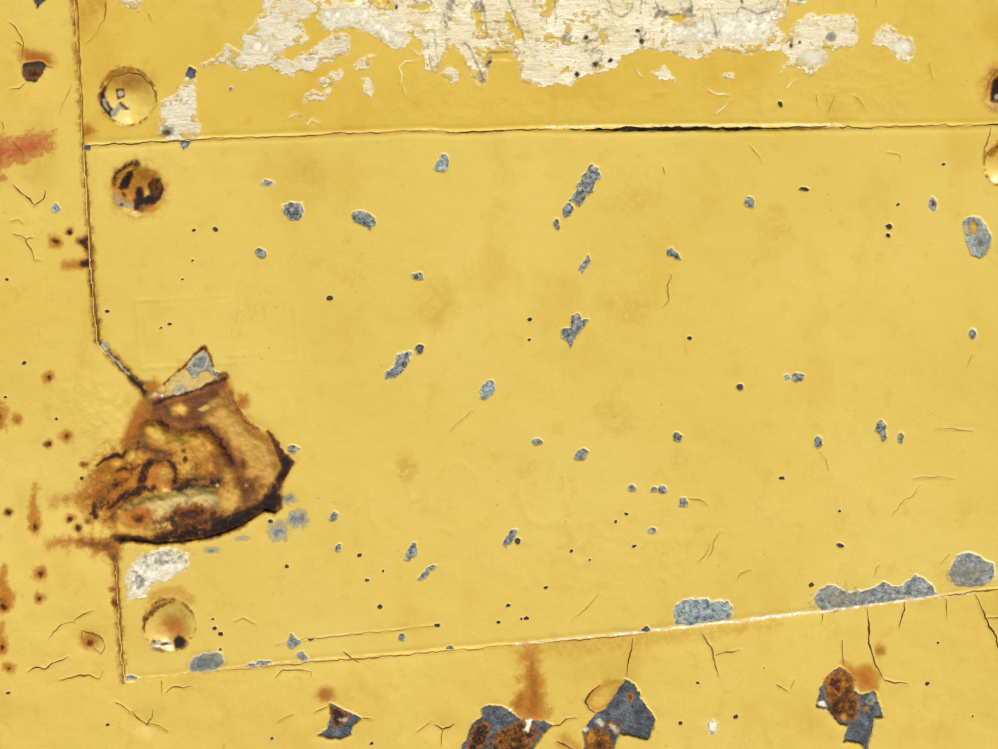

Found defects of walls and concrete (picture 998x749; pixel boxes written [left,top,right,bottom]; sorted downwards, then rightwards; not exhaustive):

peeling [158,0,858,150]
rust [43,432,72,448]
rust [49,202,263,681]
rust [27,483,40,533]
rust [0,565,15,673]
peeling [124,548,189,601]
peeling [674,599,733,625]
peeling [809,575,935,613]
crack [935,589,998,648]
rust [512,647,546,721]
peeling [319,703,361,738]
peeling [583,679,655,749]